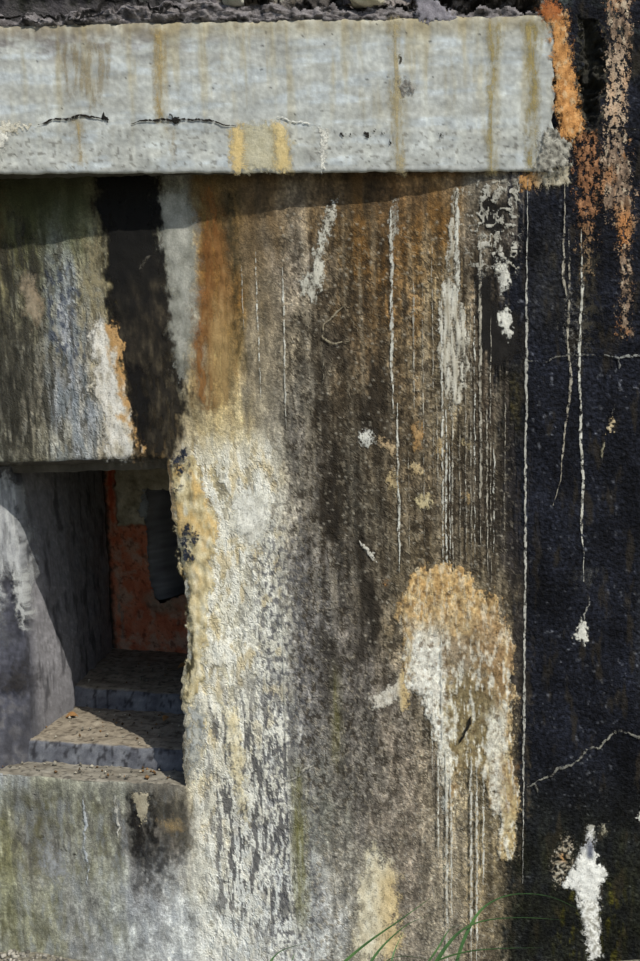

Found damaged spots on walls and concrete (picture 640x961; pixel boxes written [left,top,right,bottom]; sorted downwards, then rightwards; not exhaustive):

crack [0,0,188,25]
crack [38,112,235,126]
rust [228,120,292,173]
spalling [210,0,545,26]
rust [518,0,640,340]
leakage [90,175,193,459]
rust [194,174,244,410]
leakage [387,198,410,573]
leakage [553,181,586,544]
crack [527,353,640,369]
leakage [412,176,528,844]
crack [529,730,640,792]